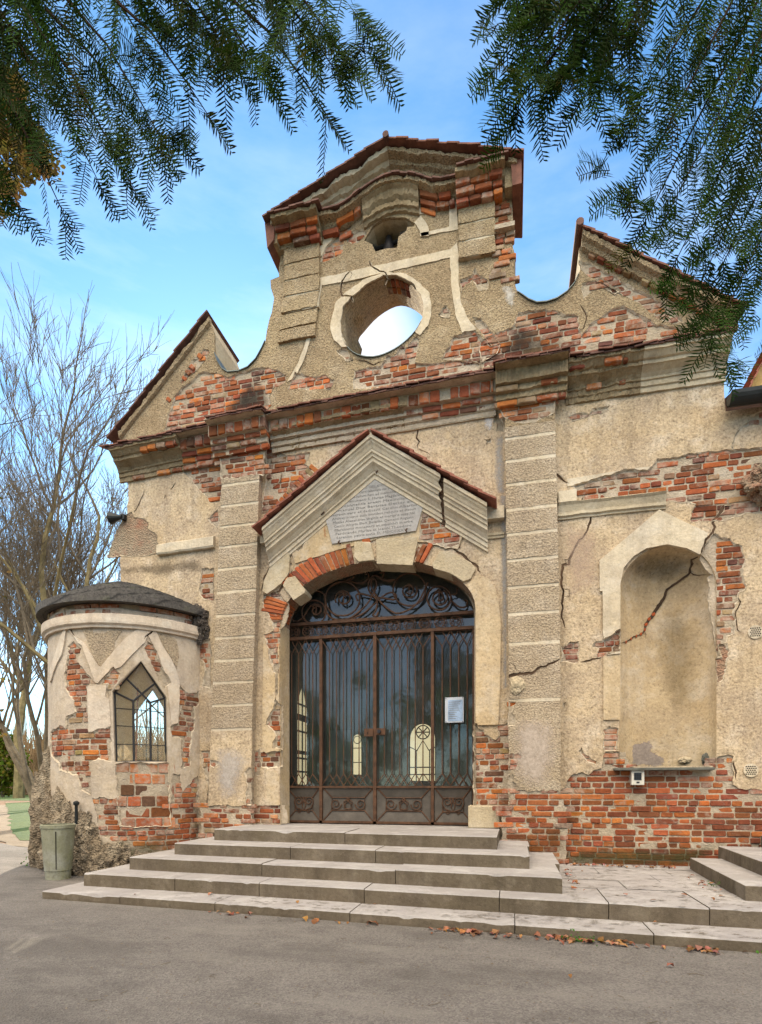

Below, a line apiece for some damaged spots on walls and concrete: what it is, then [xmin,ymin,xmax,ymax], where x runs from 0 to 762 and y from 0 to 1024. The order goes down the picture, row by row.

crack [340,261,389,303]
spalling [336,260,683,389]
spalling [163,348,334,431]
spalling [107,512,159,558]
crack [438,477,446,526]
crack [453,549,480,572]
crack [557,473,592,627]
crack [508,503,733,677]
spalling [573,411,762,683]
spalling [50,591,290,852]
spalling [472,701,762,866]